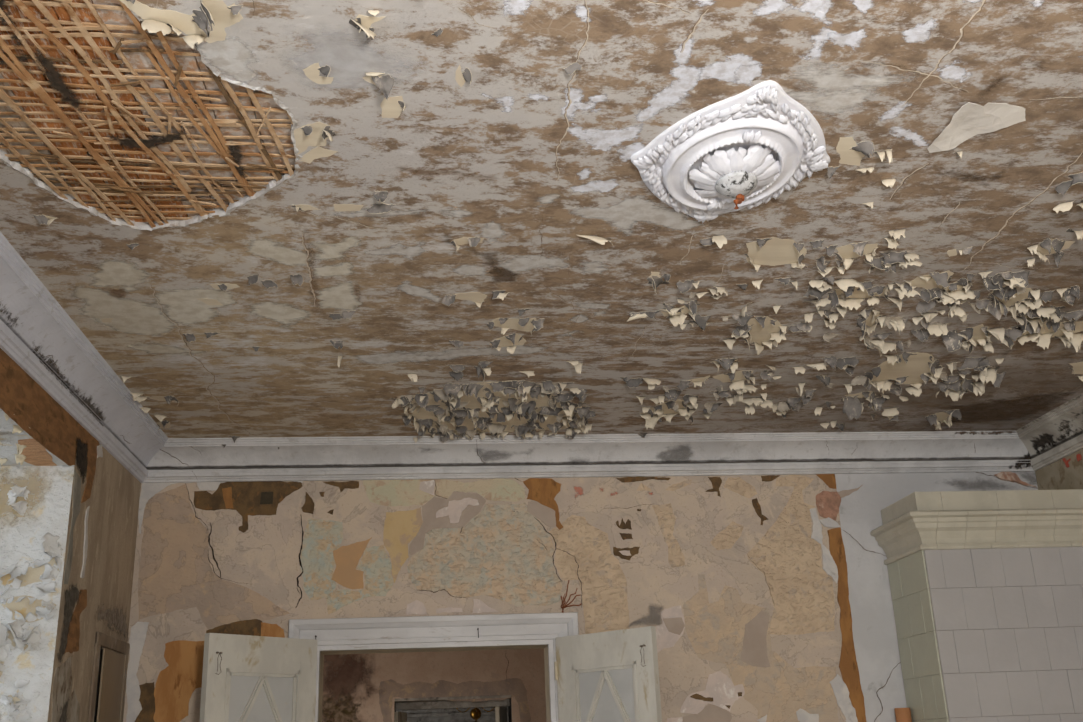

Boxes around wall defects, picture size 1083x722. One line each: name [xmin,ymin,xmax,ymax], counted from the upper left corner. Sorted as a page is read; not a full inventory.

peeling [120,0,243,49]
peeling [111,71,338,231]
damp [561,39,763,162]
damp [753,0,915,113]
damp [903,18,937,43]
damp [572,196,703,236]
damp [247,237,425,328]
peeling [390,308,596,443]
peeling [619,228,1083,438]
peeling [0,470,90,722]
crack [295,517,304,608]
crack [534,517,582,608]